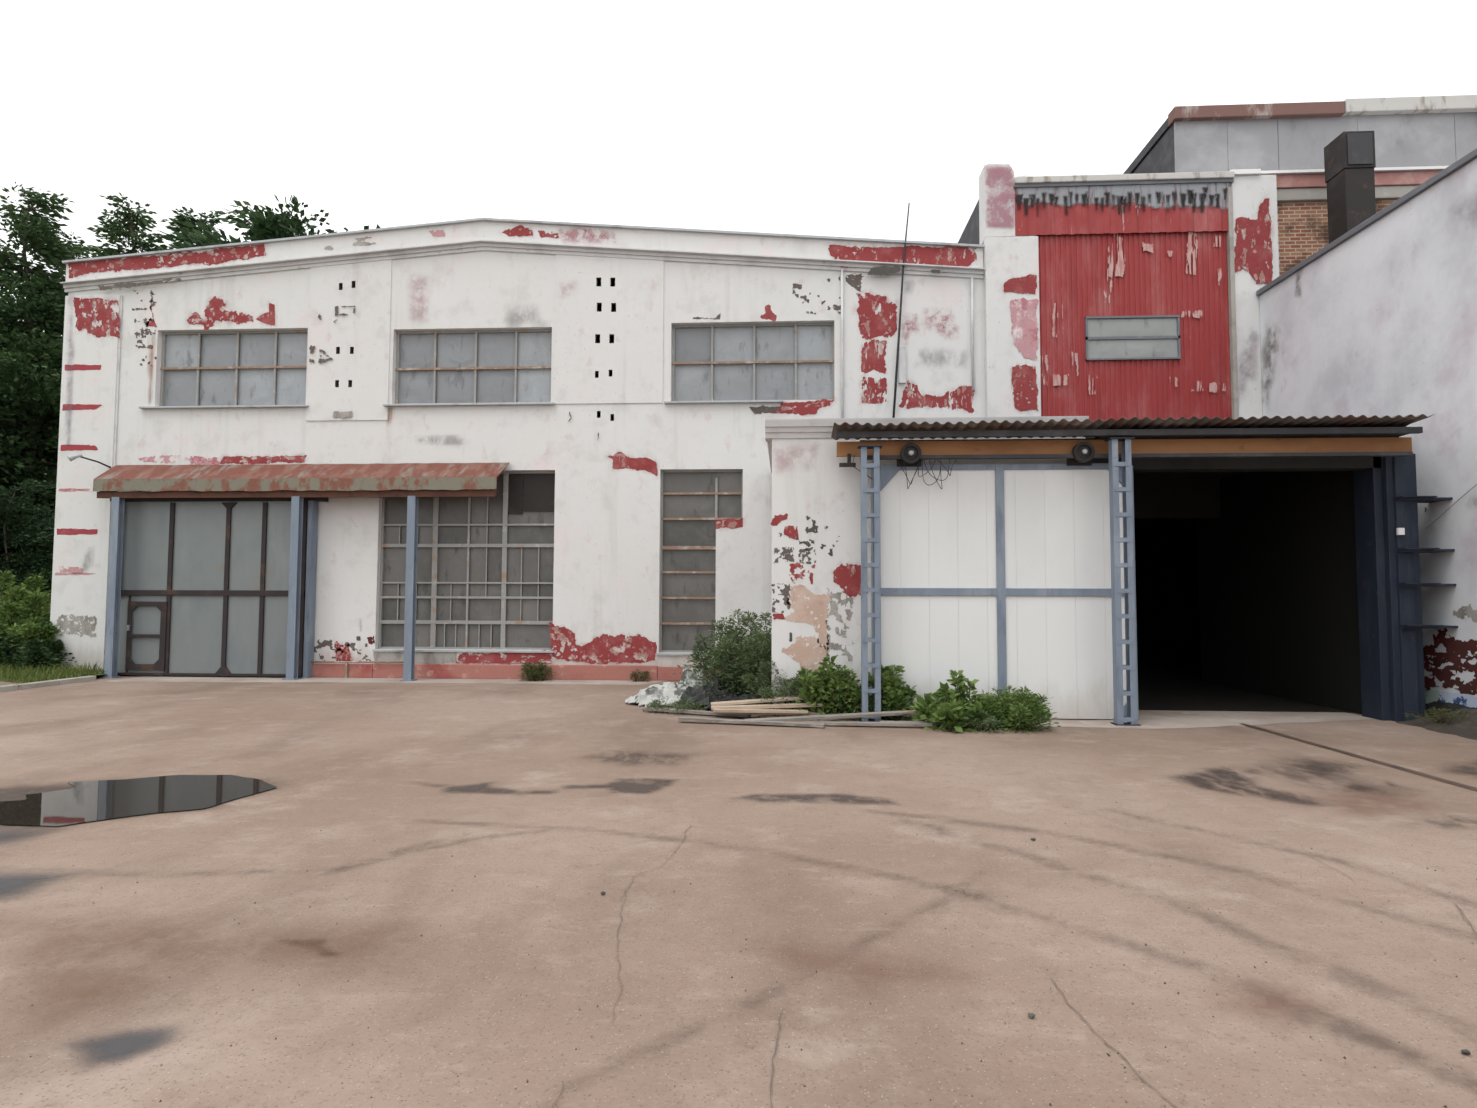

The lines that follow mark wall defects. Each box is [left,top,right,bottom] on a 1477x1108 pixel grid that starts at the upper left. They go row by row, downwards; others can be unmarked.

peeling [1234,198,1273,284]
peeling [68,244,275,367]
peeling [792,244,977,413]
peeling [1003,274,1039,411]
peeling [608,452,658,476]
peeling [715,518,743,529]
peeling [314,622,657,665]
flaking render [771,513,861,695]
peeling [1423,604,1477,708]